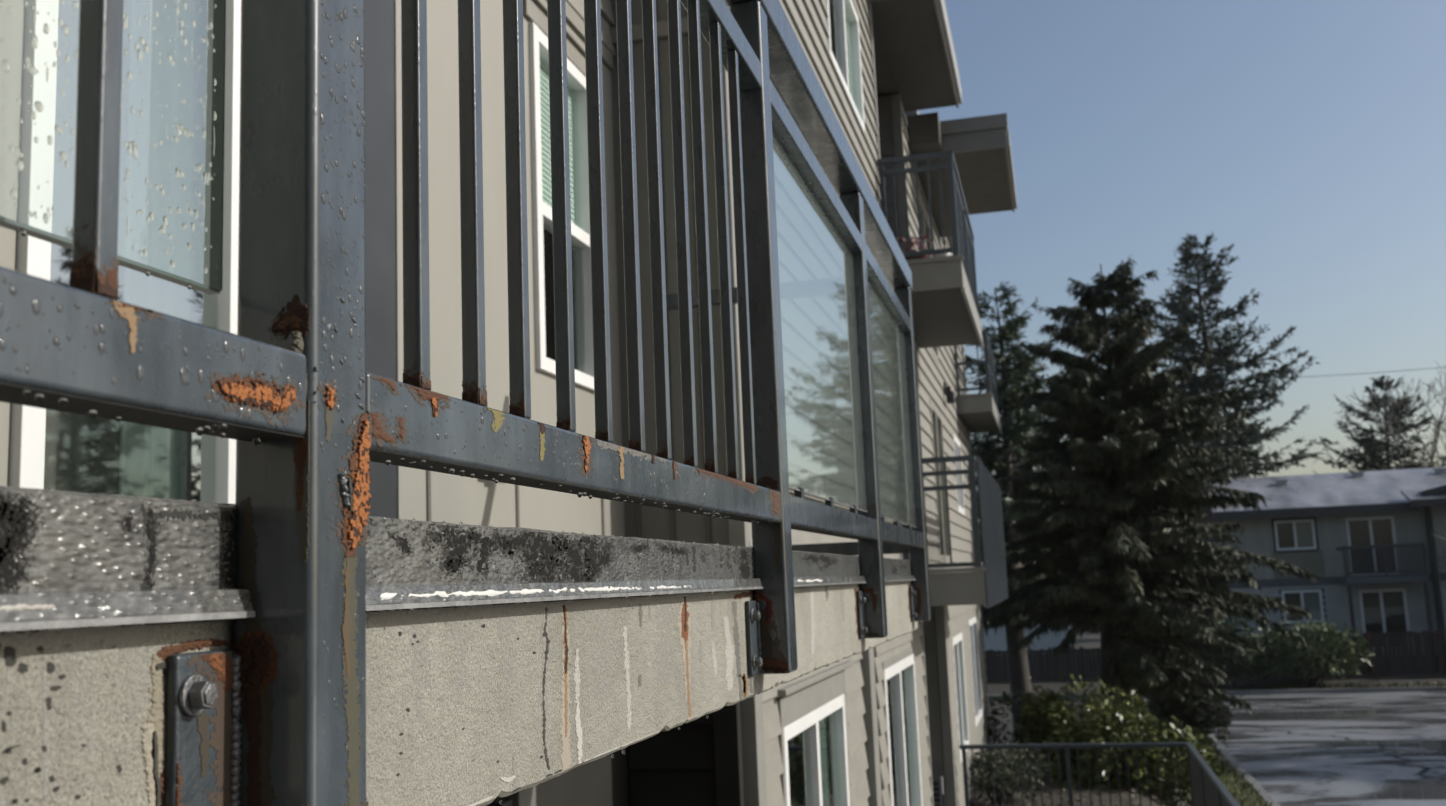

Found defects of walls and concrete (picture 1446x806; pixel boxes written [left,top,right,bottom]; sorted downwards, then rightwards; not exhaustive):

rust [69,206,165,354]
rust [268,294,310,341]
water stain [0,491,50,592]
rust [156,497,280,806]
rust [204,357,789,806]
crack [542,607,550,770]
water stain [366,593,763,764]
water stain [387,524,754,582]